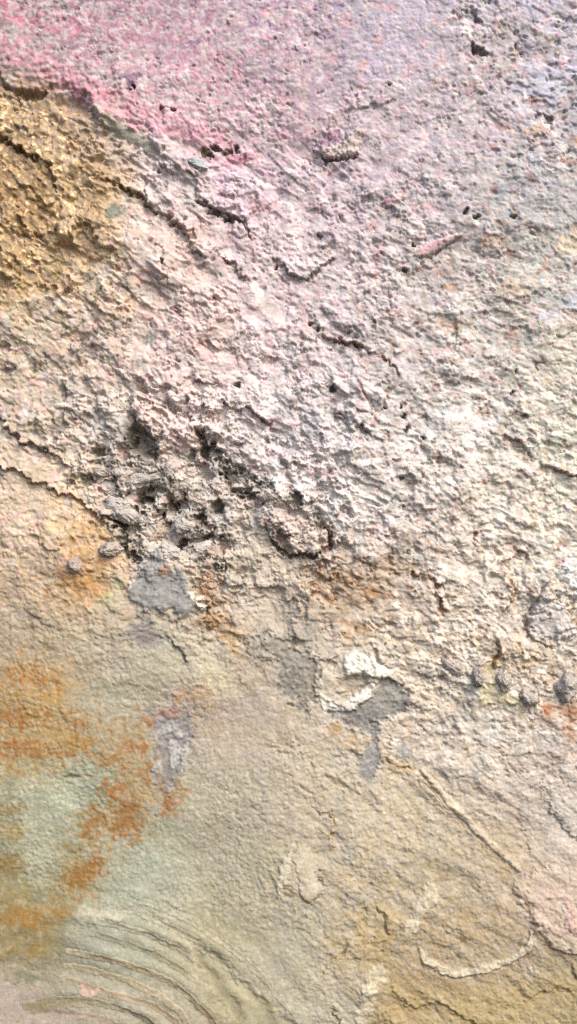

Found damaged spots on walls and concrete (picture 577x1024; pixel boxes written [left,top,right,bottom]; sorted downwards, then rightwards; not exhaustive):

crack [94,165,335,286]
corrosion [0,492,227,973]
flaking render [0,391,414,787]